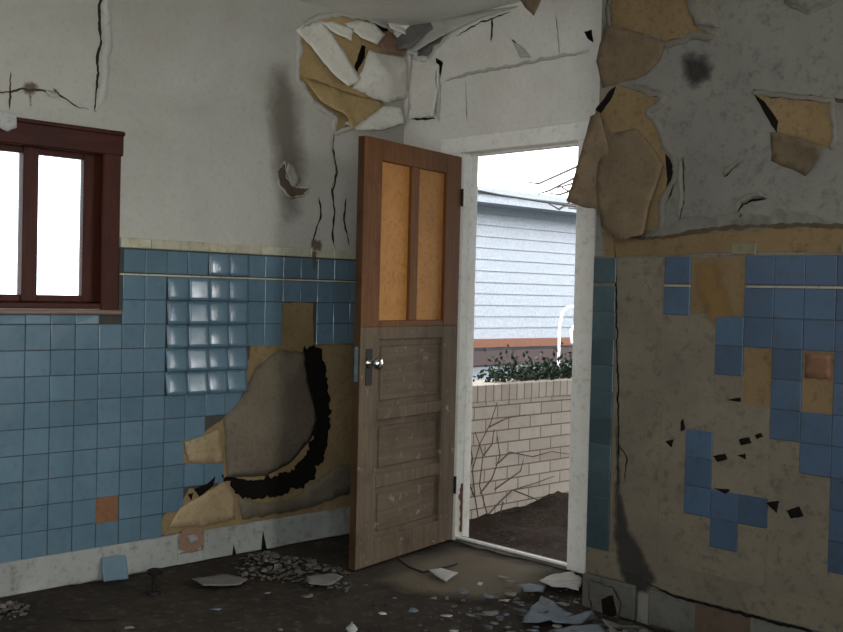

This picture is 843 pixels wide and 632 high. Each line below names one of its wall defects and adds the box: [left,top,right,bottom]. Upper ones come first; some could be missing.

crack [0,0,113,112]
peeling [295,6,518,136]
crack [311,129,349,248]
peeling [585,0,843,601]
peeling [162,302,354,544]